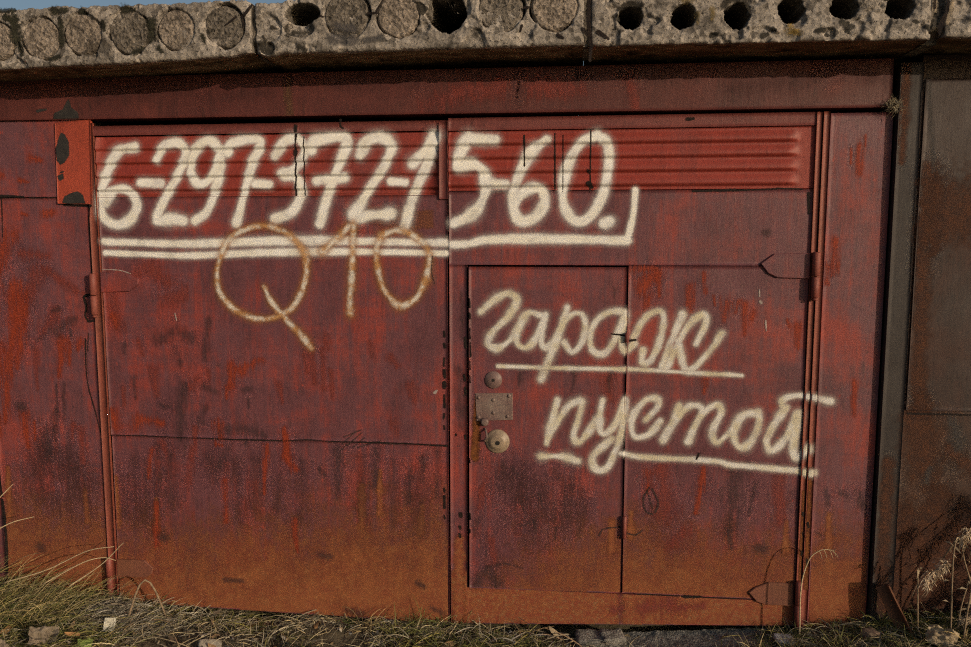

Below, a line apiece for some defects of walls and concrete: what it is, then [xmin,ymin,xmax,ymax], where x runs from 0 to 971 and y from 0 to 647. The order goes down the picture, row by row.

spalling [256,25,308,55]
spalling [839,19,855,34]